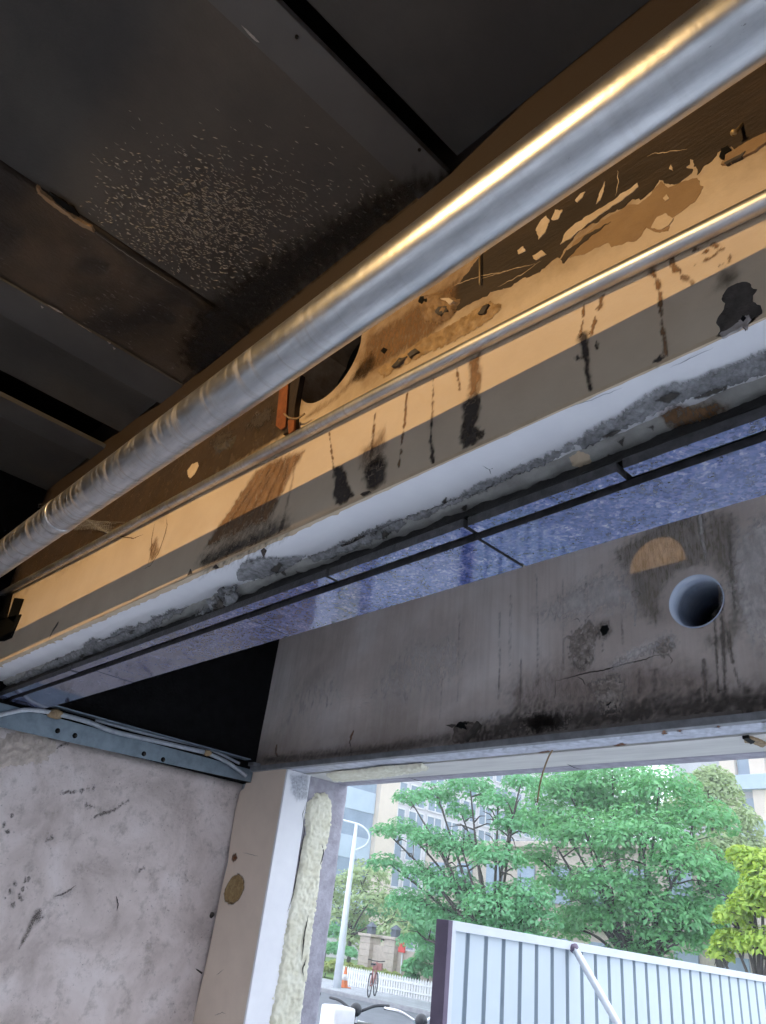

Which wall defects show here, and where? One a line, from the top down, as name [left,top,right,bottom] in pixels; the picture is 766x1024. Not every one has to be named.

peeling [378,63,766,378]
damp [576,295,604,391]
damp [650,269,668,363]
damp [329,432,354,505]
damp [363,393,408,489]
damp [456,354,484,448]
crack [553,643,673,702]
spalling [446,721,482,744]